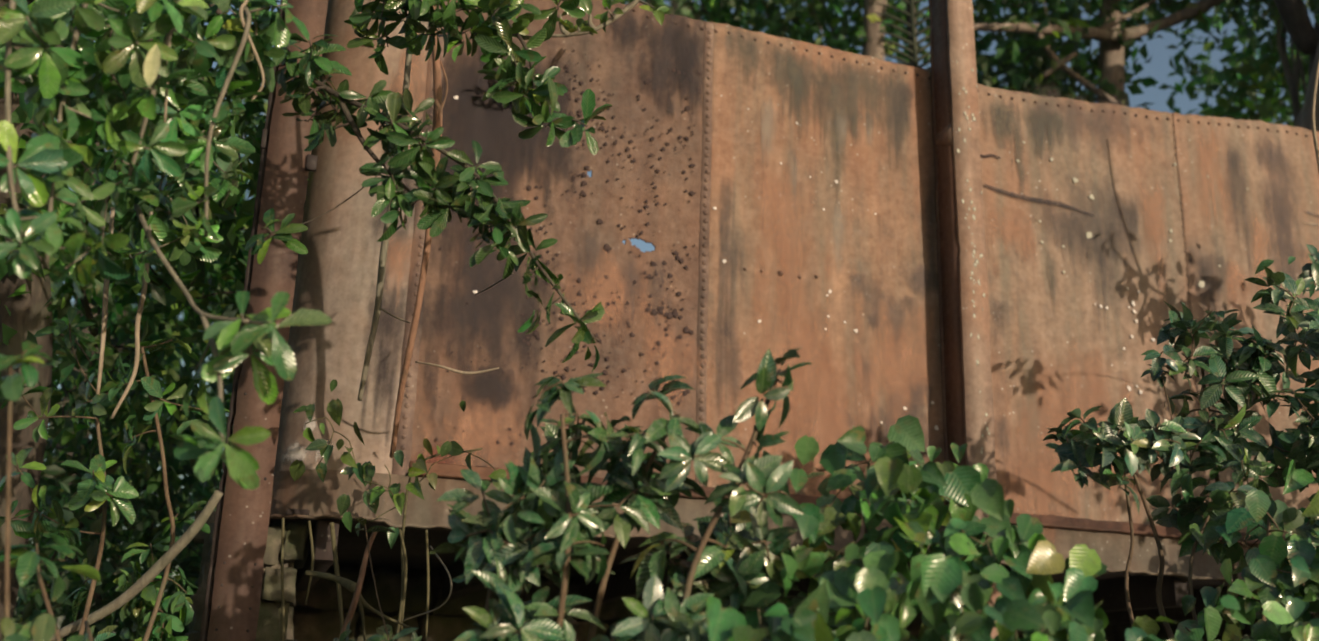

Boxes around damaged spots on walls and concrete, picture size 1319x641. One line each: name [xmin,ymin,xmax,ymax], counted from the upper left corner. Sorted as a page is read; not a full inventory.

water stain [612,11,700,113]
spalling [471,49,701,397]
corrosion [455,394,498,459]